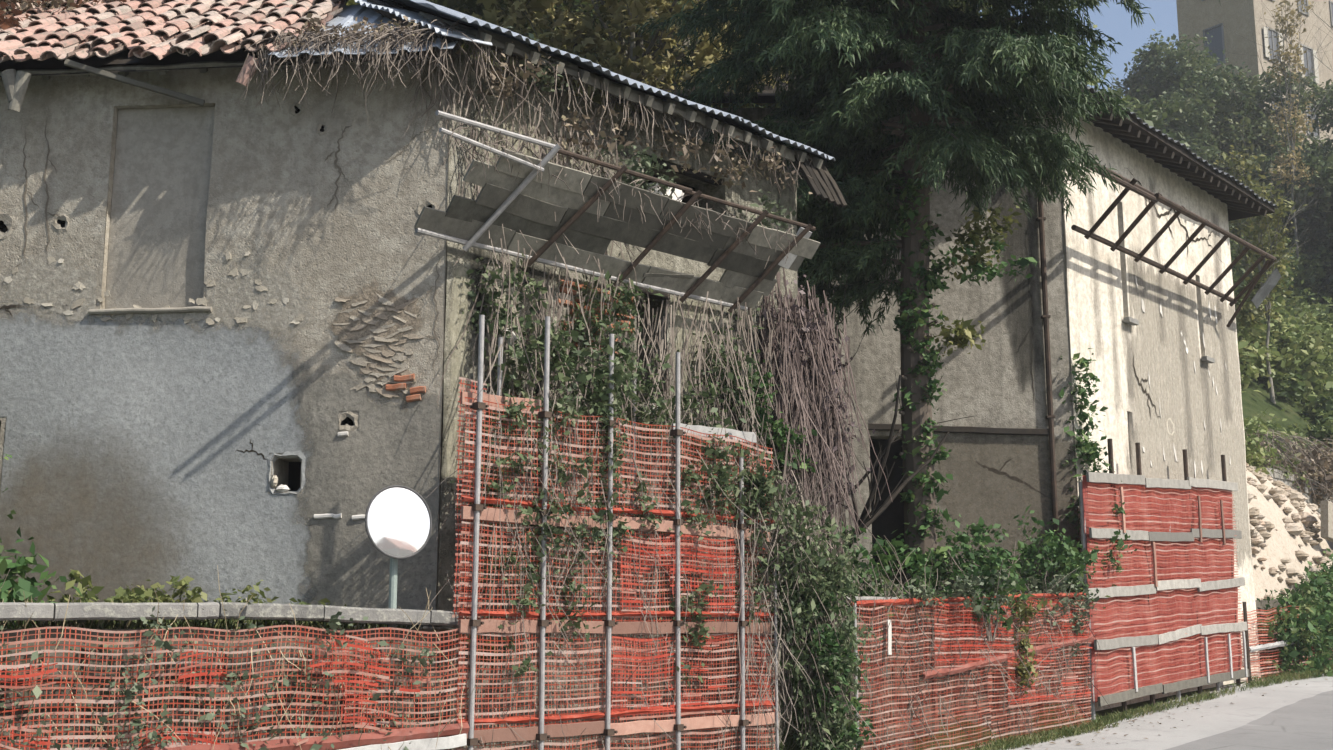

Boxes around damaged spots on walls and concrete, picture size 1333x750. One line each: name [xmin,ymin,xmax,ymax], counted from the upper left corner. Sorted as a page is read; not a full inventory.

crack [0,114,74,316]
peeling [0,211,314,344]
crack [324,125,352,217]
spalling [331,281,426,410]
crack [235,441,265,459]
spalling [338,411,359,437]